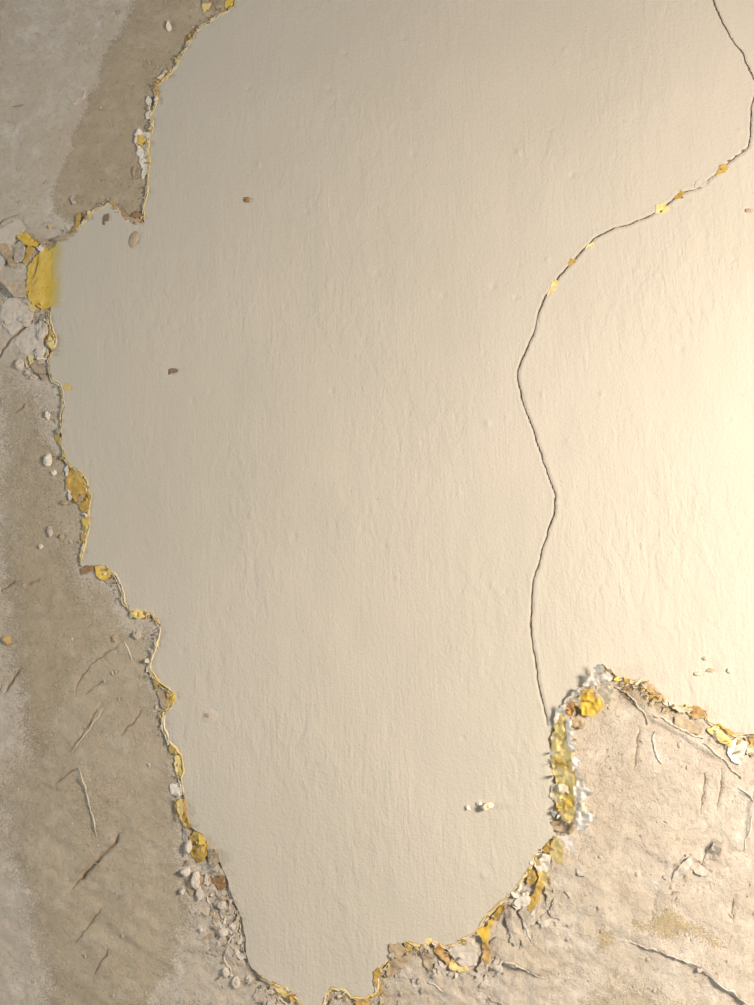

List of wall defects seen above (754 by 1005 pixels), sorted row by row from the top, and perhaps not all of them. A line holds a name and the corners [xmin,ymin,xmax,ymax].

flaking render [0,0,304,1005]
peeling [321,664,754,1005]
crack [517,0,754,723]